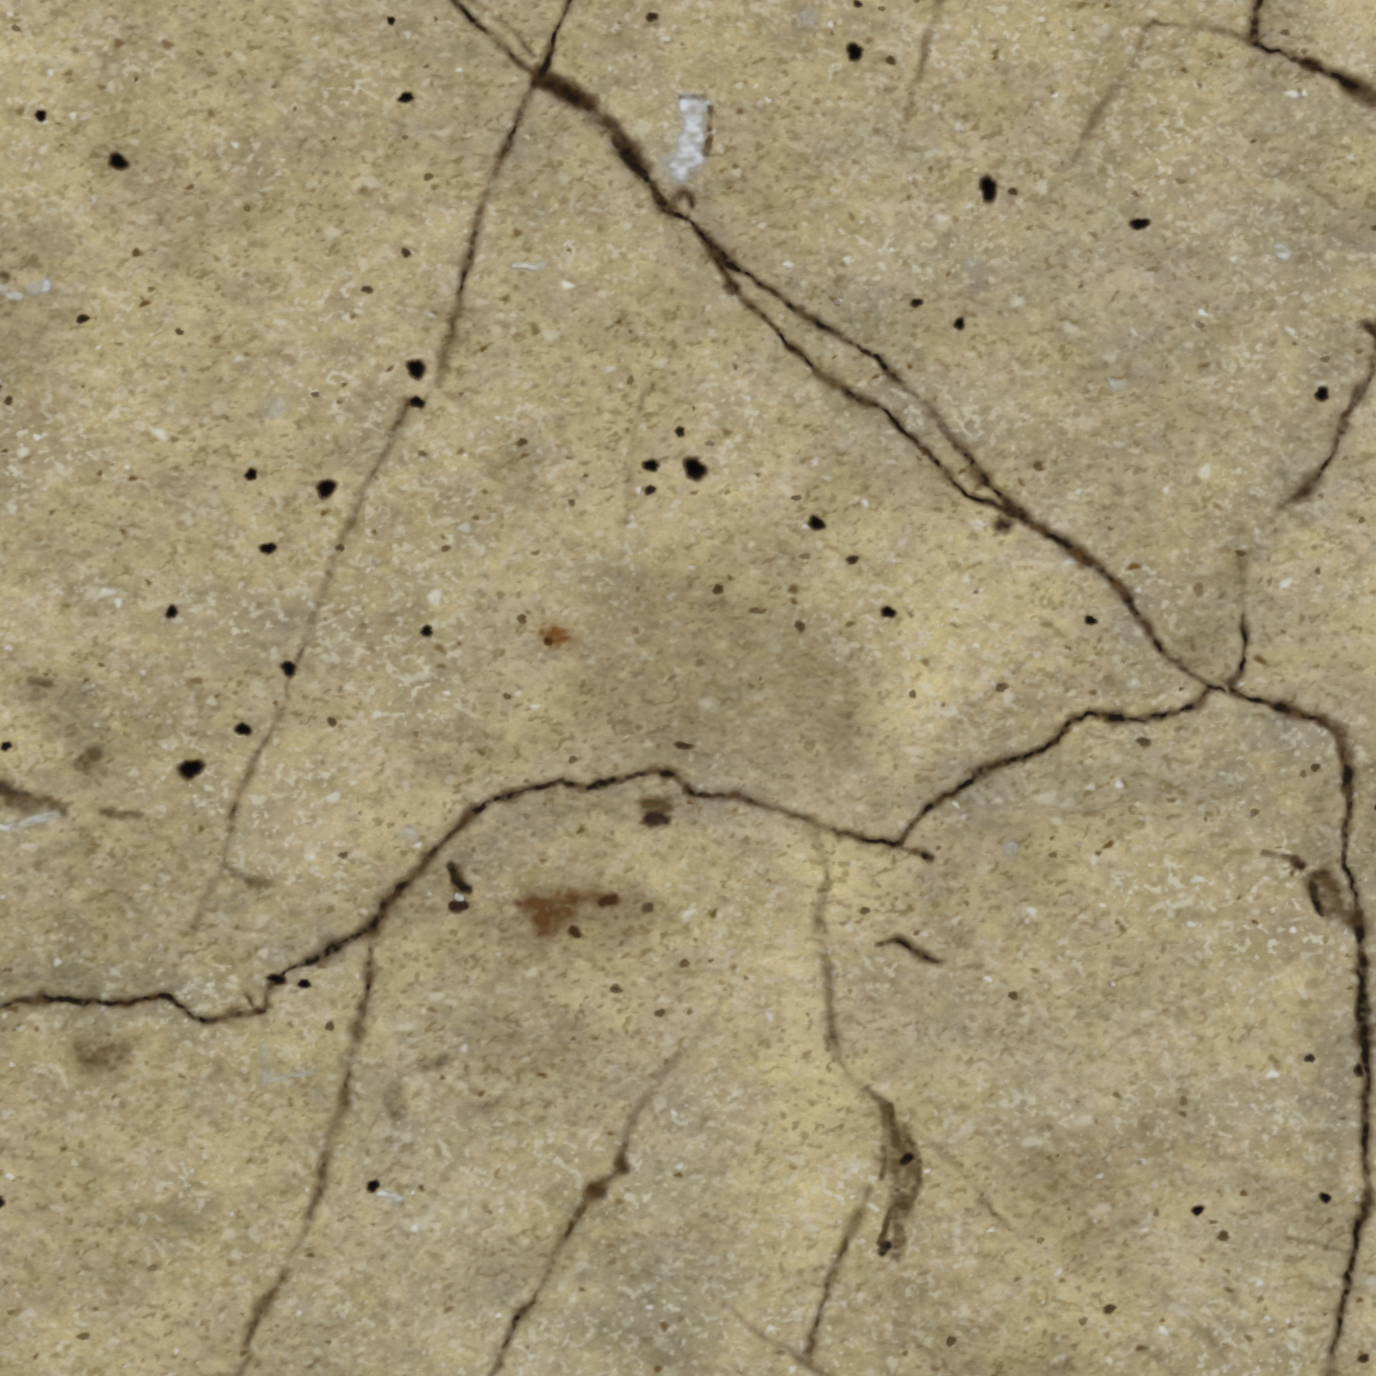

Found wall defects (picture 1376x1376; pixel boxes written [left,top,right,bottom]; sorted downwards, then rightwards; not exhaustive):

crack [452,0,488,34]
crack [442,206,483,362]
crack [393,401,410,430]
crack [494,0,1376,1357]
crack [0,768,813,1040]
rust [514,892,618,938]
crack [341,1073,350,1108]
crack [308,1163,326,1216]
crack [246,1275,284,1344]
crack [494,1293,537,1371]